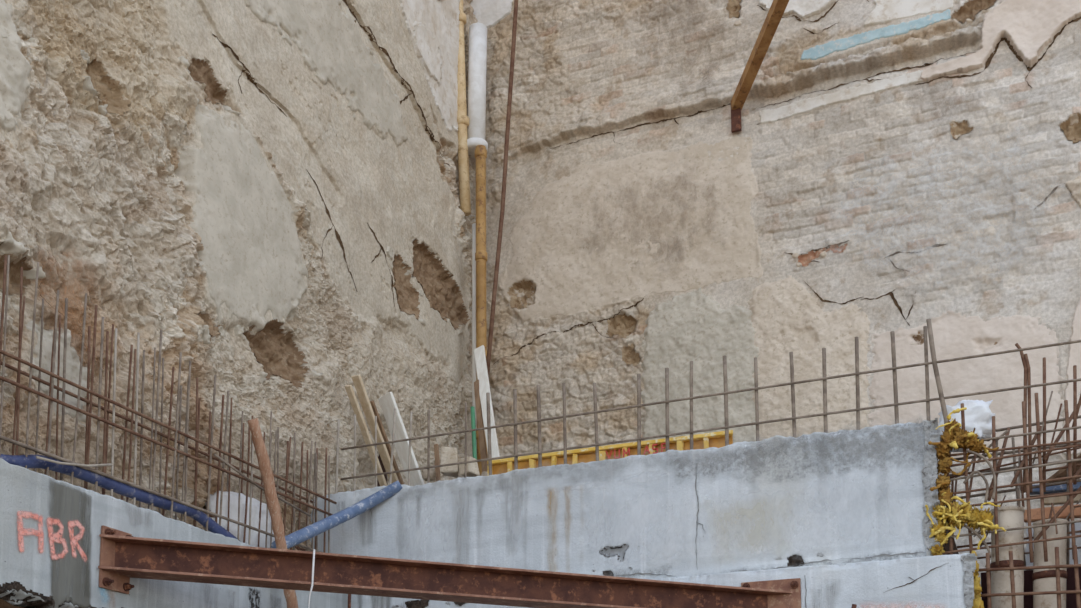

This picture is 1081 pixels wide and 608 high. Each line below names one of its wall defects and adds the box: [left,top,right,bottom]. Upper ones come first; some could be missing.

crack [213,34,284,113]
spalling [726,0,741,26]
peeling [783,0,837,20]
crack [757,17,1081,125]
peeling [864,0,1081,82]
crack [550,104,730,149]
spalling [949,120,973,139]
spalling [1060,112,1081,143]
crack [787,240,949,326]
spalling [0,232,1081,608]
crack [618,461,705,577]
crack [743,552,947,608]